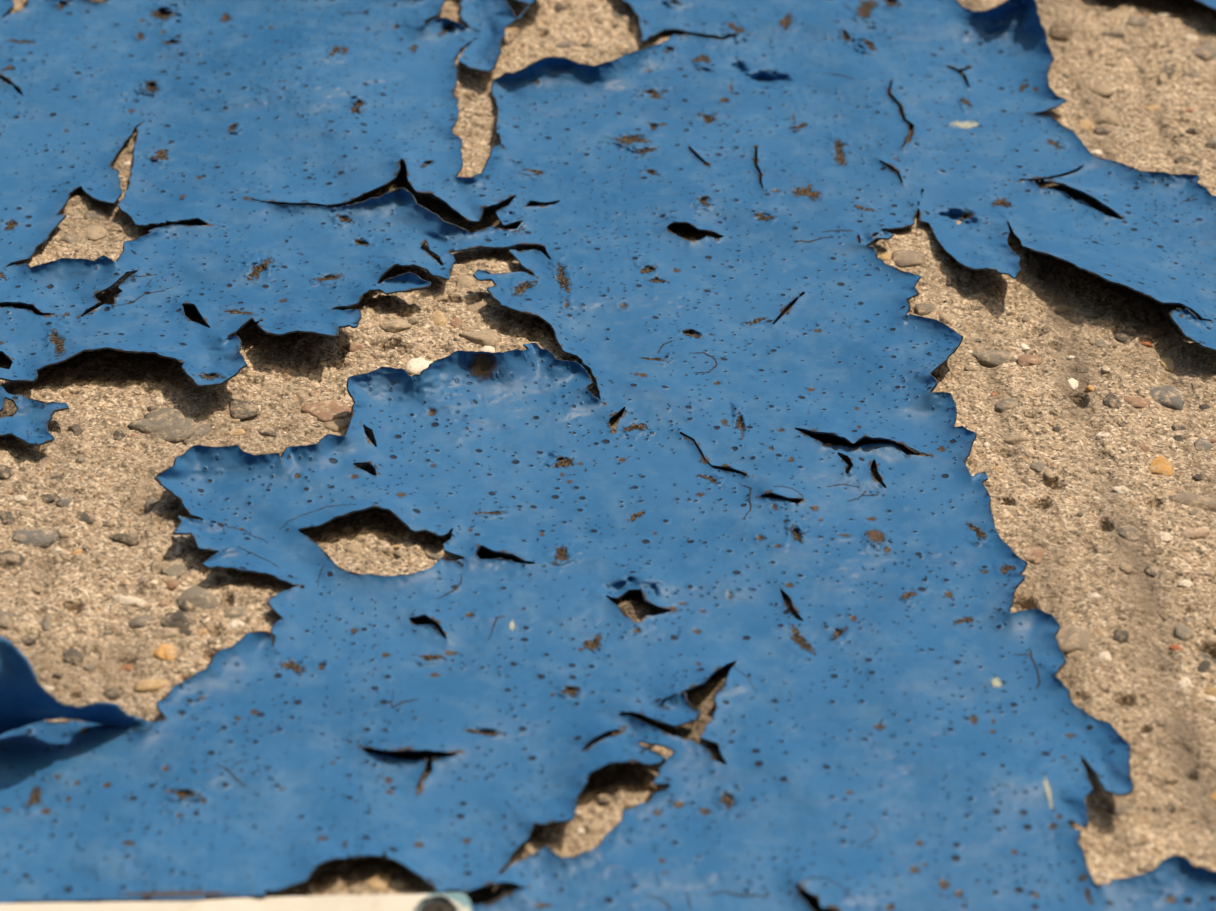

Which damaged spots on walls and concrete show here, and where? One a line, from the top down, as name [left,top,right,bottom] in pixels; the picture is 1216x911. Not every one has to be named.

peeling [3,0,27,18]
peeling [56,0,309,22]
peeling [425,0,750,177]
peeling [0,125,207,281]
crack [1020,167,1082,185]
peeling [0,217,603,735]
crack [680,433,878,519]
crack [891,440,932,456]
peeling [855,0,1216,911]
peeling [462,729,502,737]
peeling [500,743,673,874]
peeling [211,855,451,900]